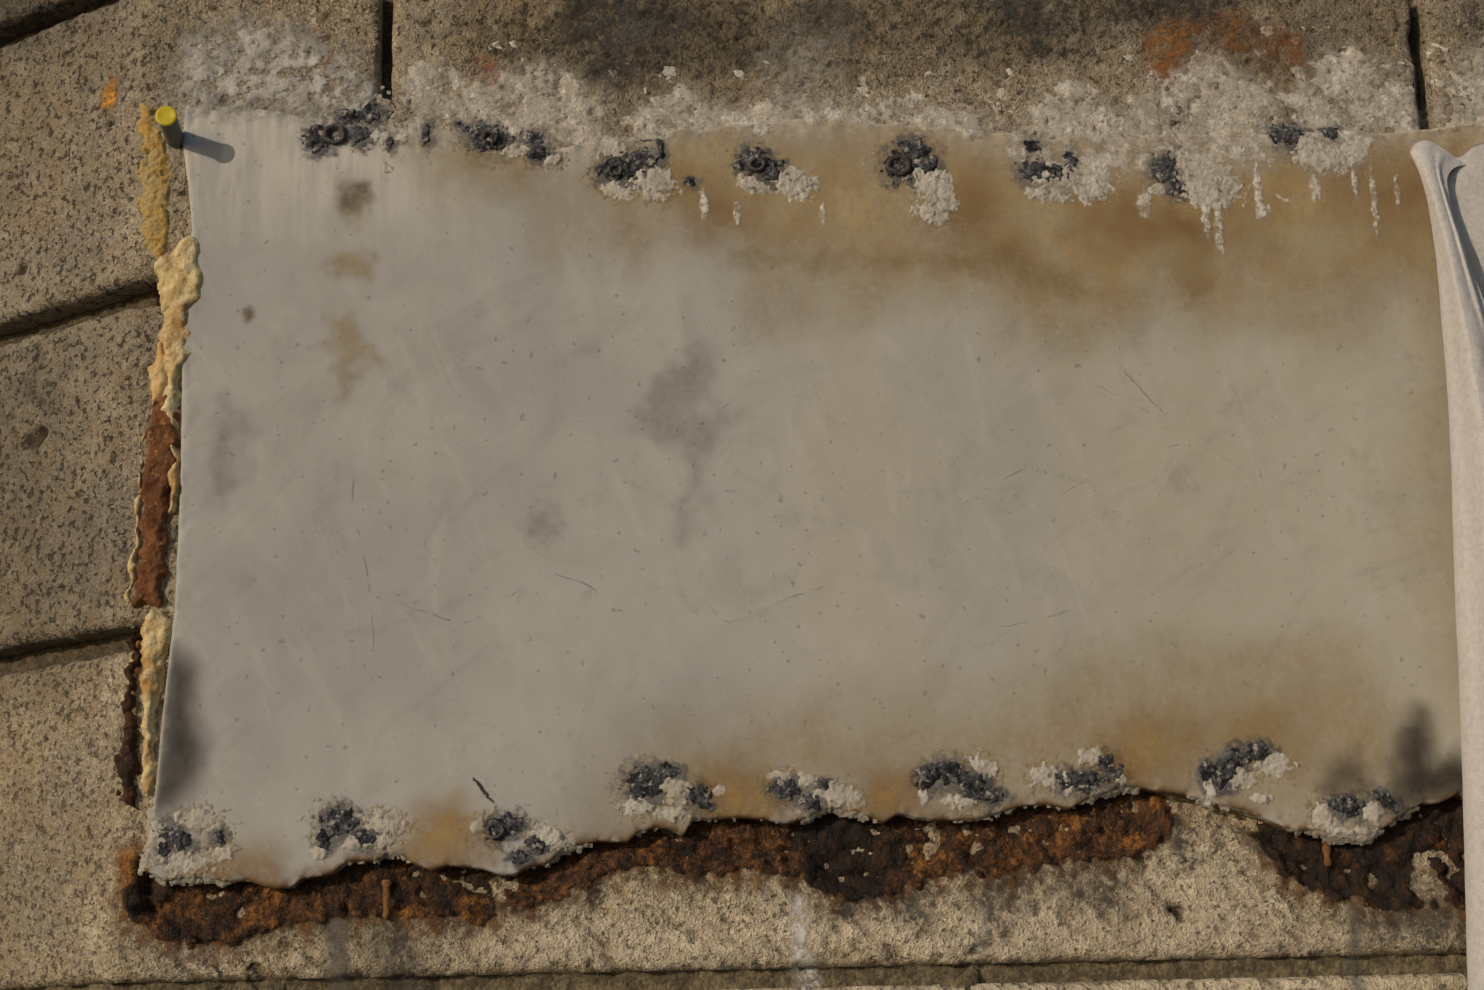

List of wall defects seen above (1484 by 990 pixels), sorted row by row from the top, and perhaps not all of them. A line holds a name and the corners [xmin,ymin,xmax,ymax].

corrosion [1144,20,1195,77]
water stain [394,0,1484,327]
corrosion [116,770,1182,963]
corrosion [1240,797,1466,928]